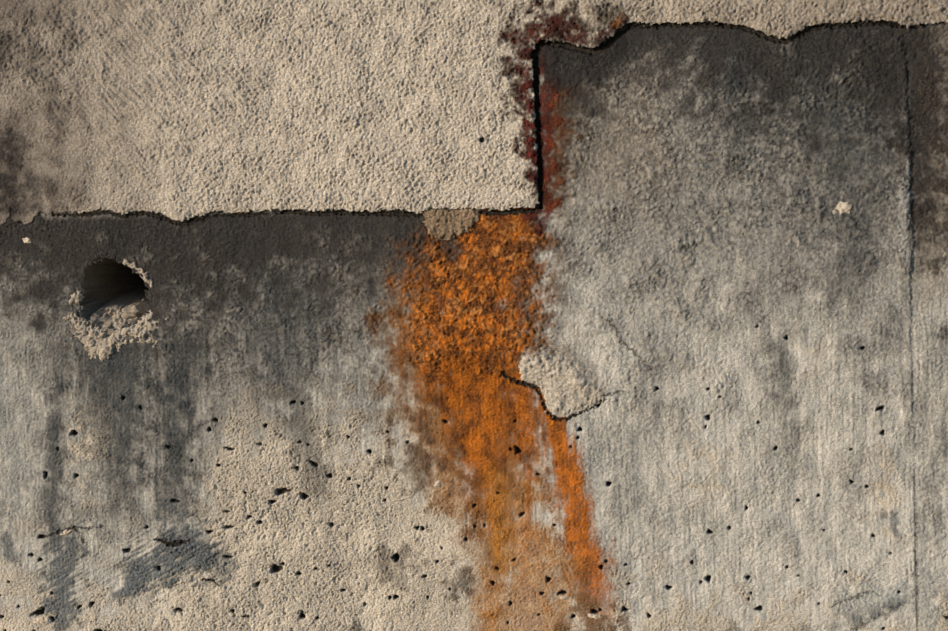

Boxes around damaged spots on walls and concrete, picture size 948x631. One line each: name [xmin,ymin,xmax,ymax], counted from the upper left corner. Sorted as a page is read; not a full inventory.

leakage [538,20,948,229]
peeling [420,207,481,241]
spalling [832,201,852,215]
spalling [896,157,913,275]
spalling [63,254,168,365]
leakage [0,156,425,480]
corrosion [390,0,626,631]
leakage [46,413,61,513]
peeling [30,519,95,631]
peeling [112,525,232,602]
peeling [818,580,920,631]